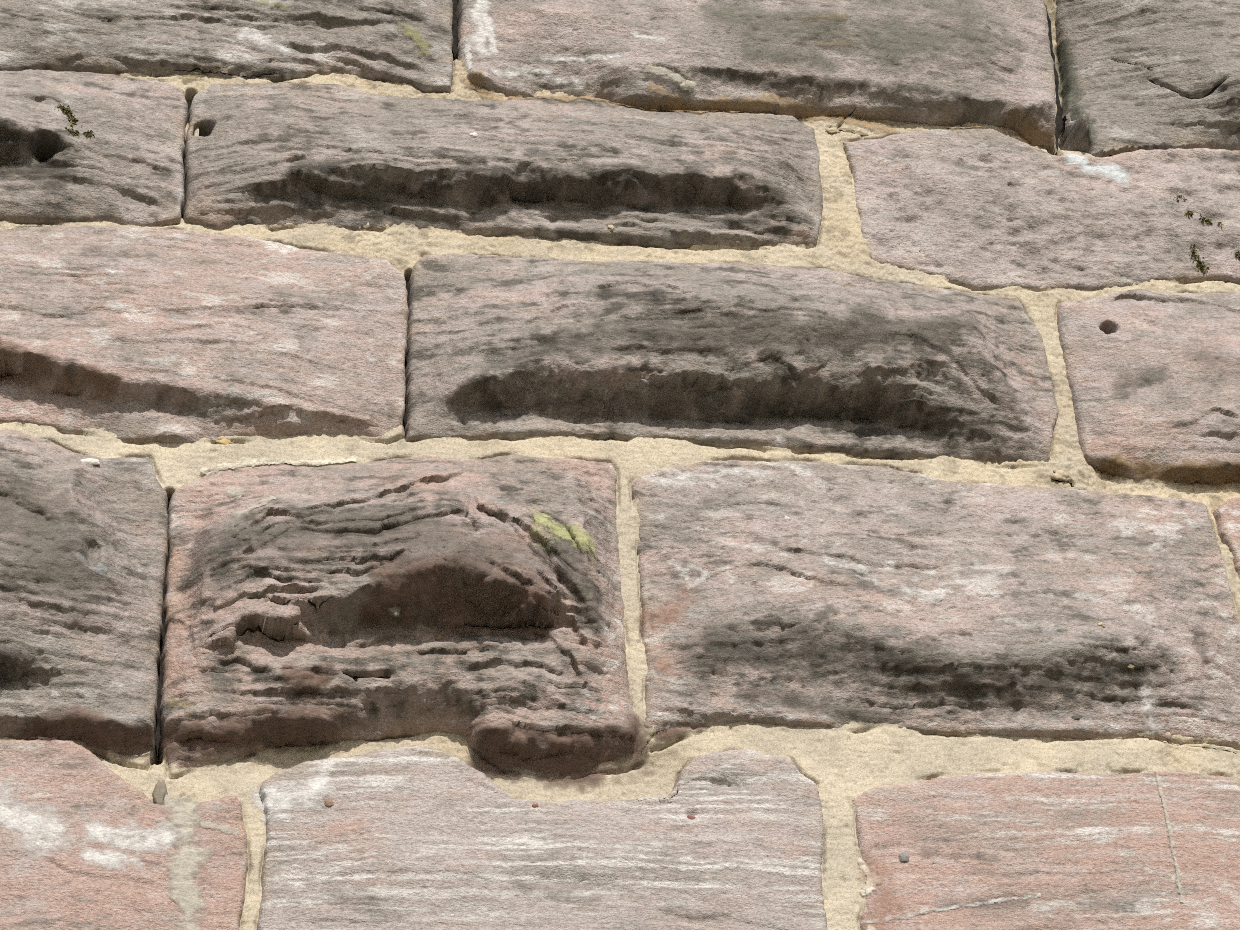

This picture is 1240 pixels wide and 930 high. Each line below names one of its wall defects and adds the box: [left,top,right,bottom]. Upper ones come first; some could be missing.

crack [1115,61,1226,99]
water stain [0,783,66,856]
water stain [80,795,179,868]